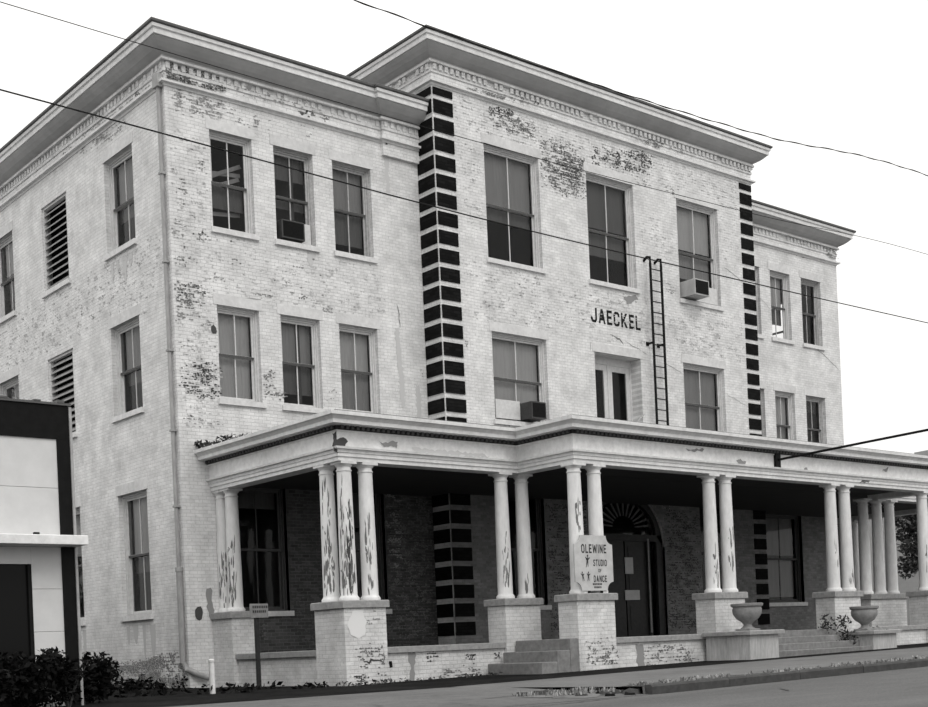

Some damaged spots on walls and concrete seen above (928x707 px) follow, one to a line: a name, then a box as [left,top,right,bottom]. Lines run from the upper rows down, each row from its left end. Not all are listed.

peeling [63,85,150,154]
peeling [163,60,330,137]
peeling [455,87,739,260]
spalling [0,128,385,429]
peeling [219,535,237,608]
peeling [365,514,373,564]